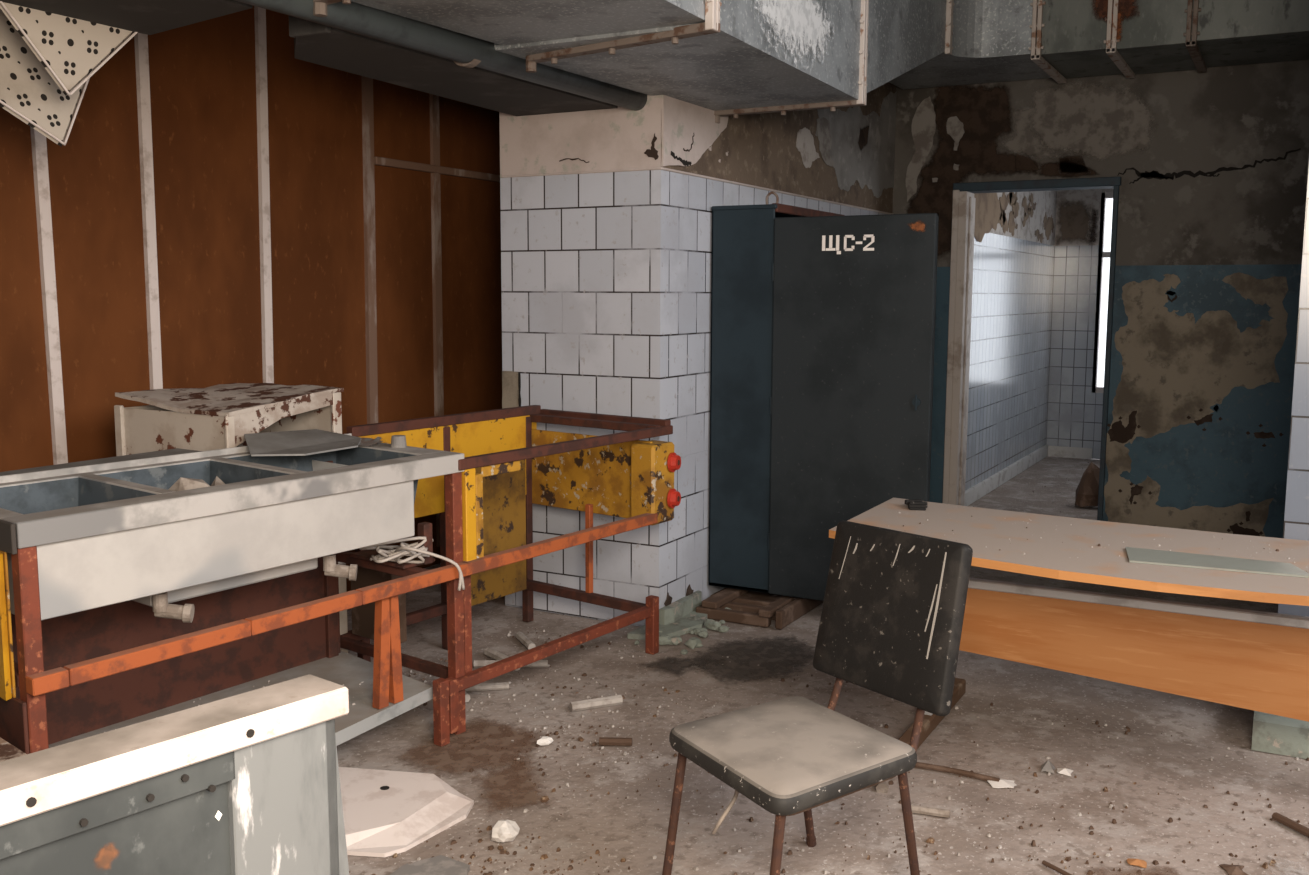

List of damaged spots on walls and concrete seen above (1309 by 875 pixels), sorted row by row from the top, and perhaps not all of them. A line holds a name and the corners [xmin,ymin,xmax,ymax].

peeling [1001,82,1154,160]
crack [1117,148,1301,184]
peeling [1104,272,1288,551]